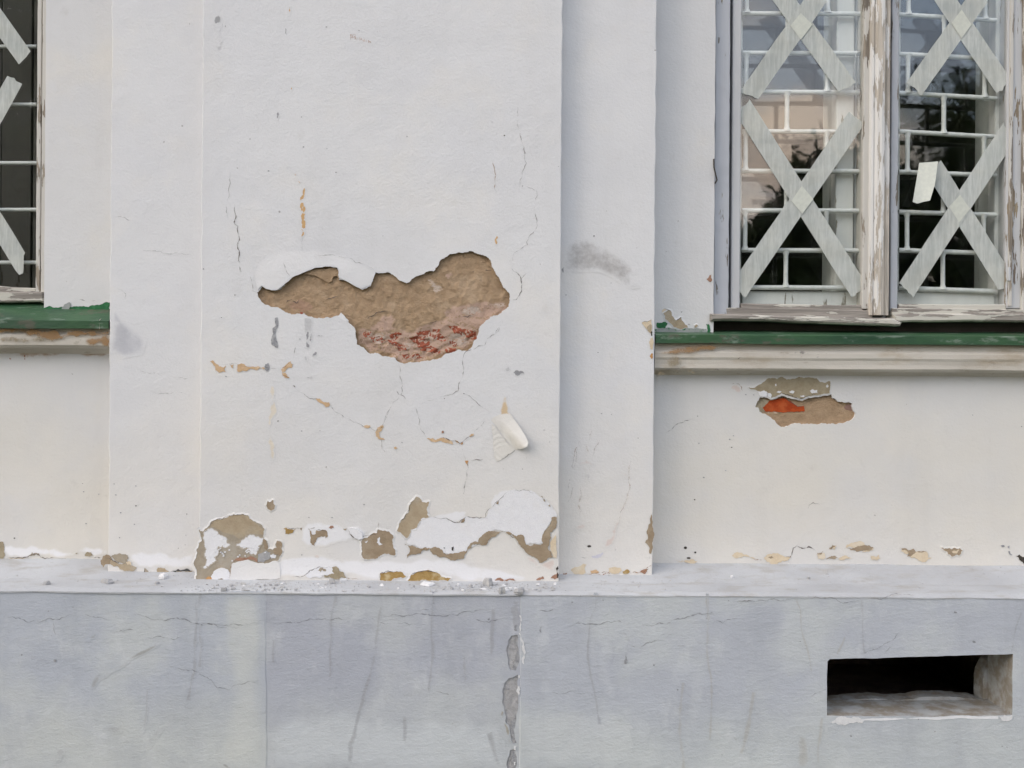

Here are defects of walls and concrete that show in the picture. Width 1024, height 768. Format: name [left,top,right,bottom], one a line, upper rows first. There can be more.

spalling [258,251,510,364]
spalling [747,375,854,427]
peeling [70,489,648,592]
peeling [732,552,791,564]
peeling [817,541,880,560]
peeling [901,548,930,562]
peeling [940,546,964,558]
spalling [502,615,526,768]